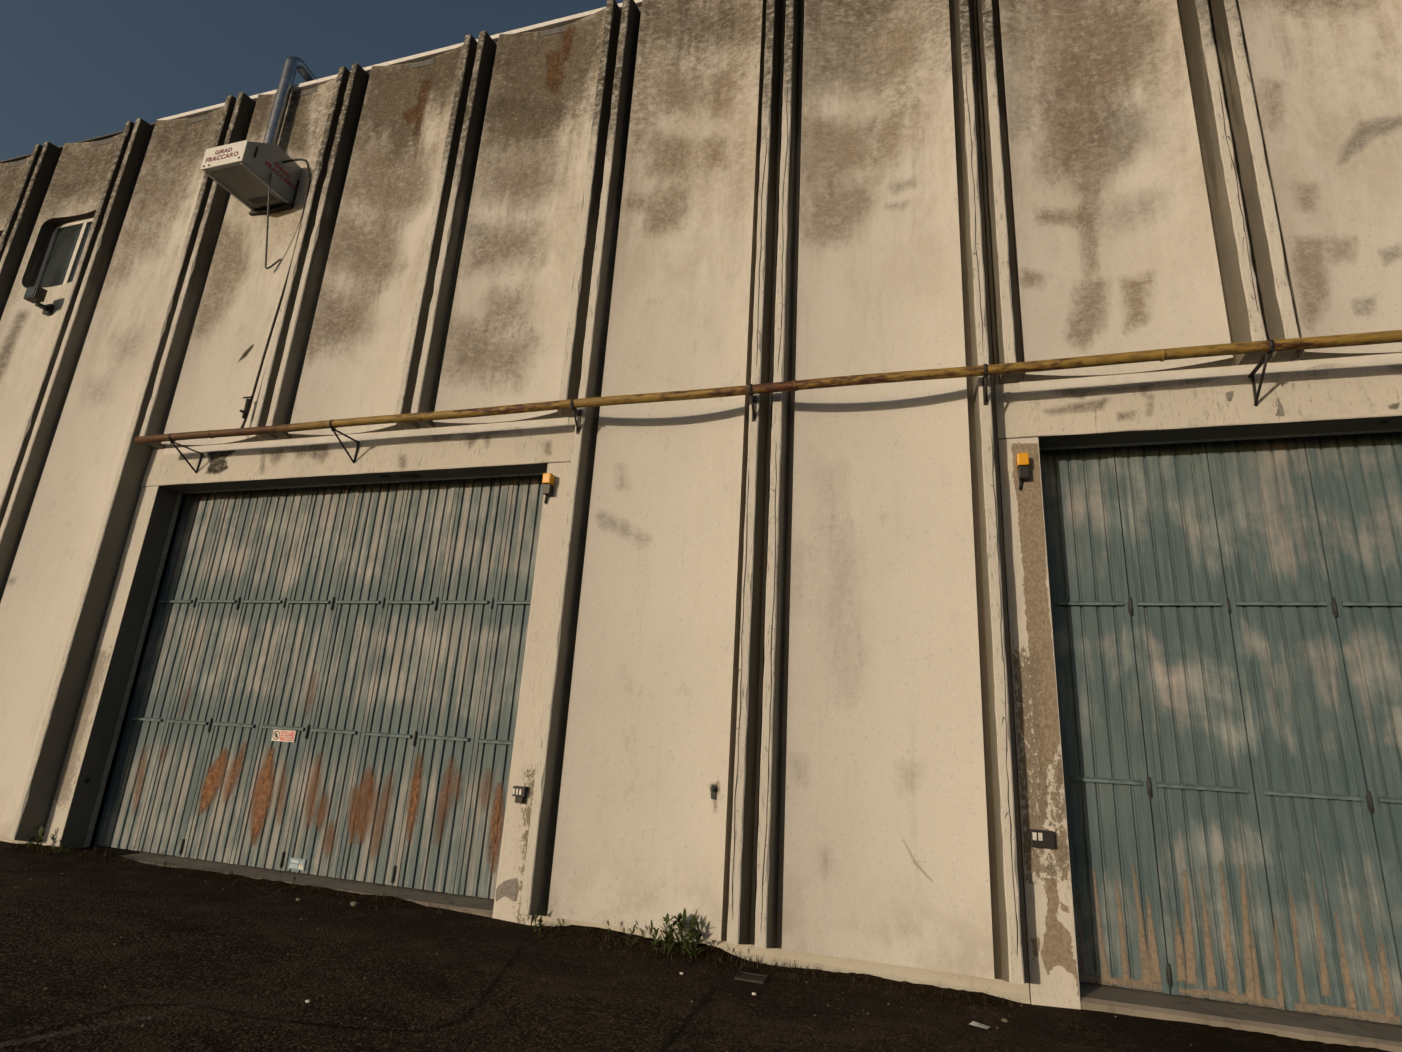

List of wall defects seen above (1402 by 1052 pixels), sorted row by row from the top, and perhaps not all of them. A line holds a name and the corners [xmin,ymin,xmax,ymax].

leakage [351,47,460,212]
leakage [487,12,603,197]
leakage [1042,0,1153,266]
rust [199,743,245,811]
rust [250,749,285,842]
rust [307,759,390,852]
rust [407,758,421,838]
rust [483,784,504,870]
peeling [1011,443,1400,1024]